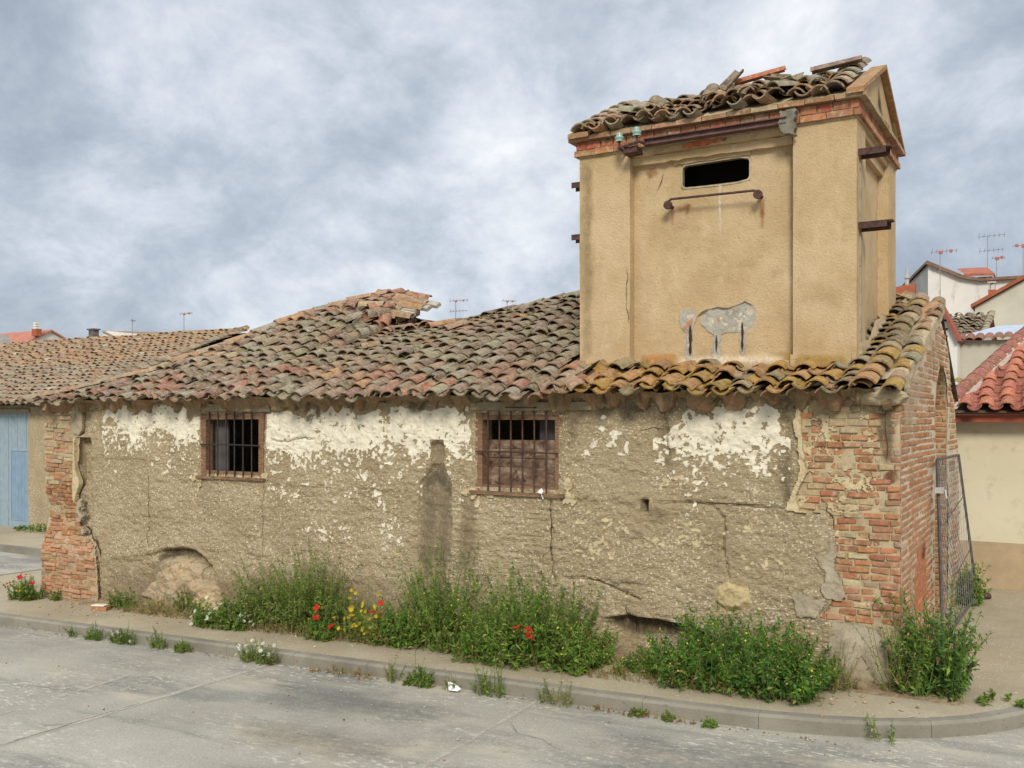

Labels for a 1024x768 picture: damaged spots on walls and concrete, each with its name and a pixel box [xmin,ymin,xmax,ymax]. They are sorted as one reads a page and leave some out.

peeling [846,408,895,462]
peeling [102,405,494,570]
peeling [553,404,848,578]
spalling [873,470,896,484]
crack [542,504,638,632]
crack [657,502,787,579]
peeling [792,592,827,618]